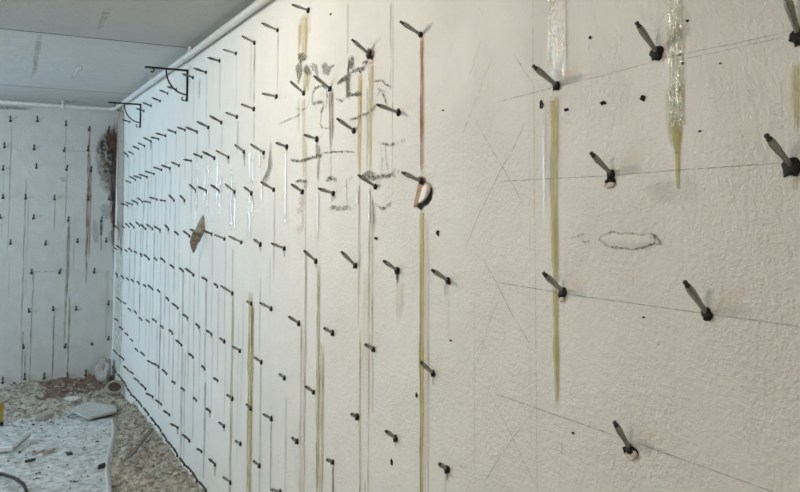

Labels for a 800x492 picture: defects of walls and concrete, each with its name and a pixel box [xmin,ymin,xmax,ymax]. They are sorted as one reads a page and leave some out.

leakage [668,91,680,187]
spalling [414,183,432,210]
leakage [543,101,558,278]